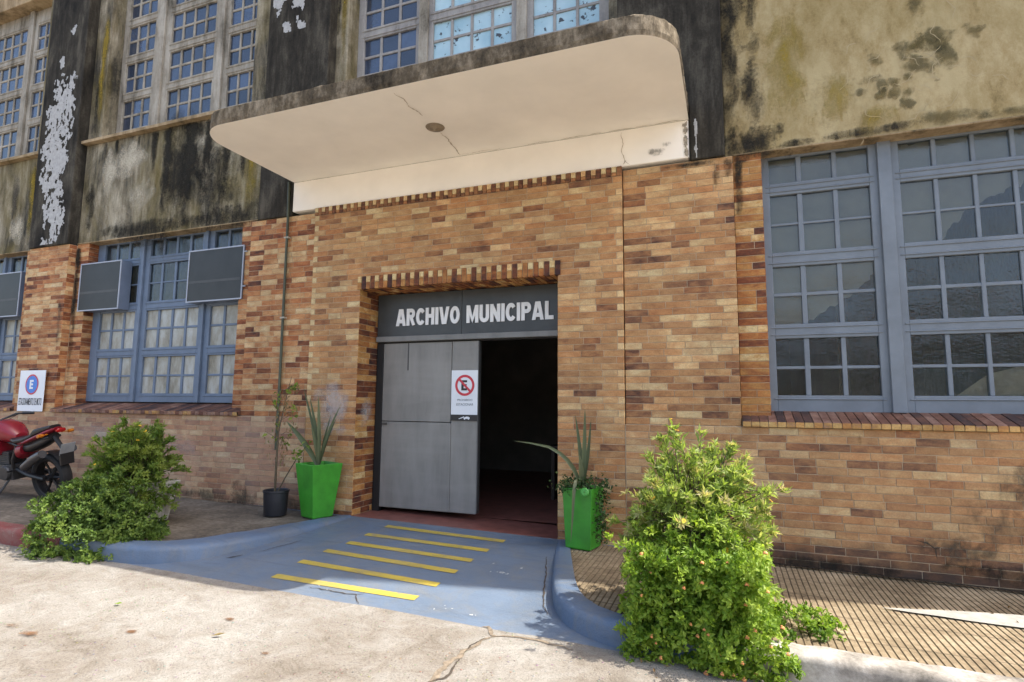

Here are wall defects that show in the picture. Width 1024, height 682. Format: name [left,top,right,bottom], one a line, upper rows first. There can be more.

peeling [273,0,306,33]
peeling [39,56,78,245]
water stain [714,0,800,213]
water stain [833,122,907,140]
water stain [925,112,965,123]
water stain [11,173,36,220]
water stain [86,185,95,228]
water stain [103,110,259,251]
crack [541,557,549,614]
crack [428,626,572,682]